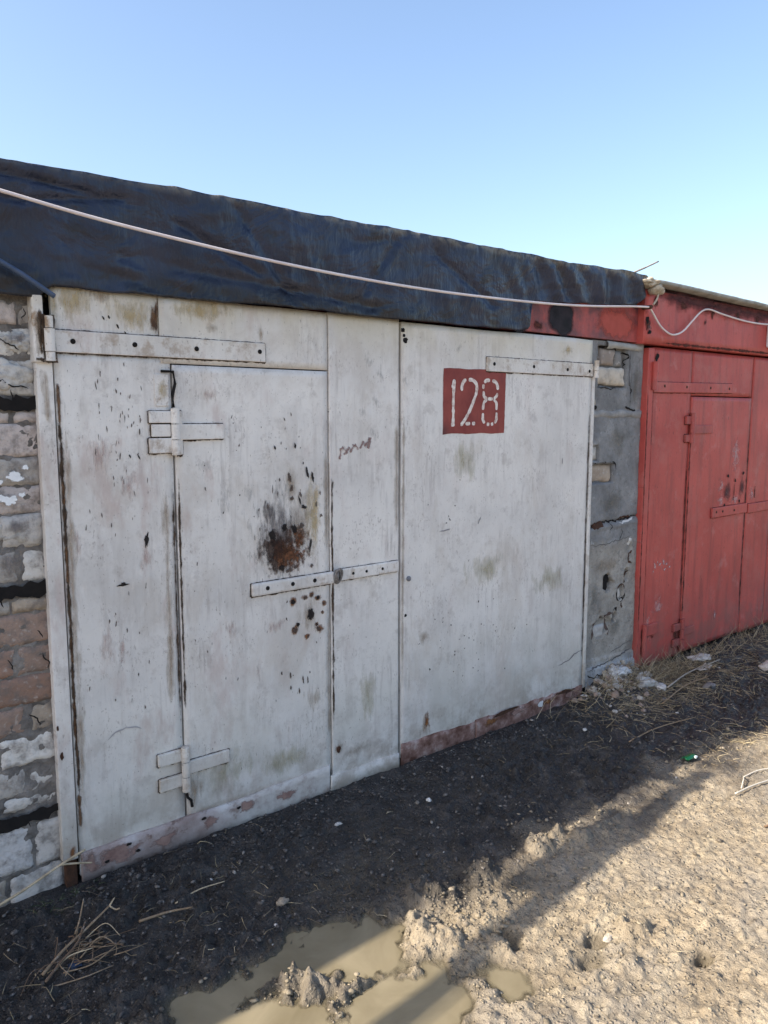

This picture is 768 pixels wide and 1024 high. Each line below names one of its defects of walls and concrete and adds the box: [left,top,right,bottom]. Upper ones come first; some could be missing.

rust [46,384,83,826]
rust [259,462,335,727]
spalling [591,538,632,640]